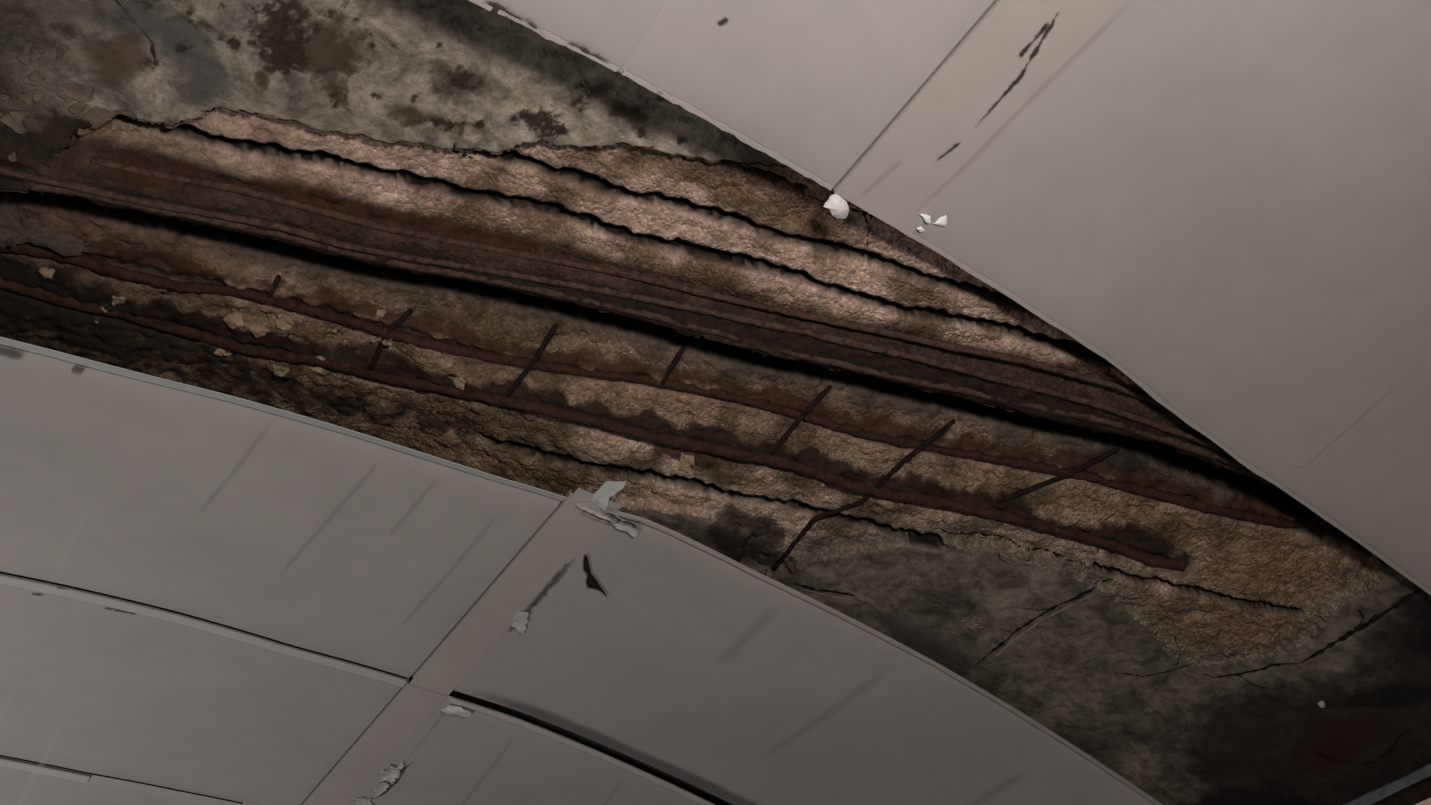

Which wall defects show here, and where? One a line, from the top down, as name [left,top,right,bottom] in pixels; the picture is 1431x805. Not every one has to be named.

leakage [98,0,375,108]
leakage [371,93,485,135]
leakage [429,65,486,94]
leakage [569,42,606,61]
leakage [511,79,665,143]
corrosion [56,153,1318,557]
spalling [0,42,1387,667]
leakage [880,616,965,670]
crack [1119,587,1423,689]
leakage [1182,597,1431,805]